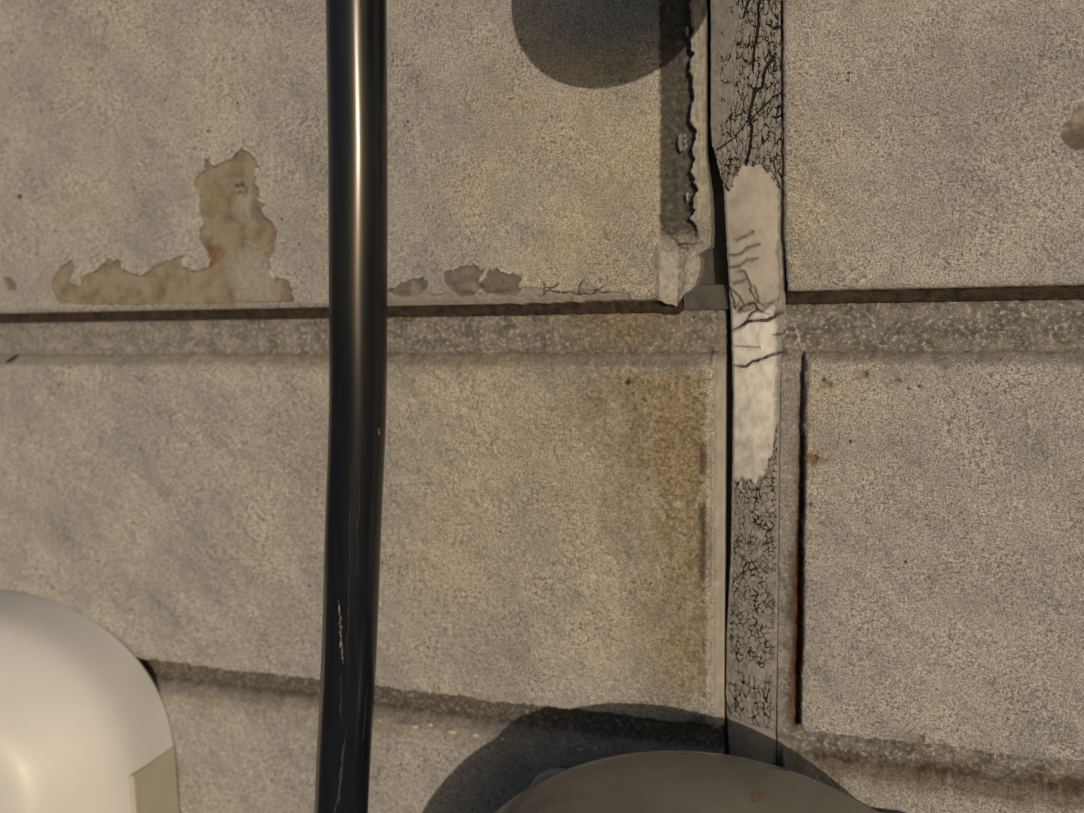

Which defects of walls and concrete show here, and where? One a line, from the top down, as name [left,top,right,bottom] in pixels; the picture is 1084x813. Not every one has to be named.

crack [716,0,784,188]
spalling [1061,101,1084,150]
peeling [52,150,294,306]
peeling [387,278,427,296]
peeling [444,264,483,296]
spalling [658,246,710,306]
crack [729,236,799,368]
crack [729,430,777,735]